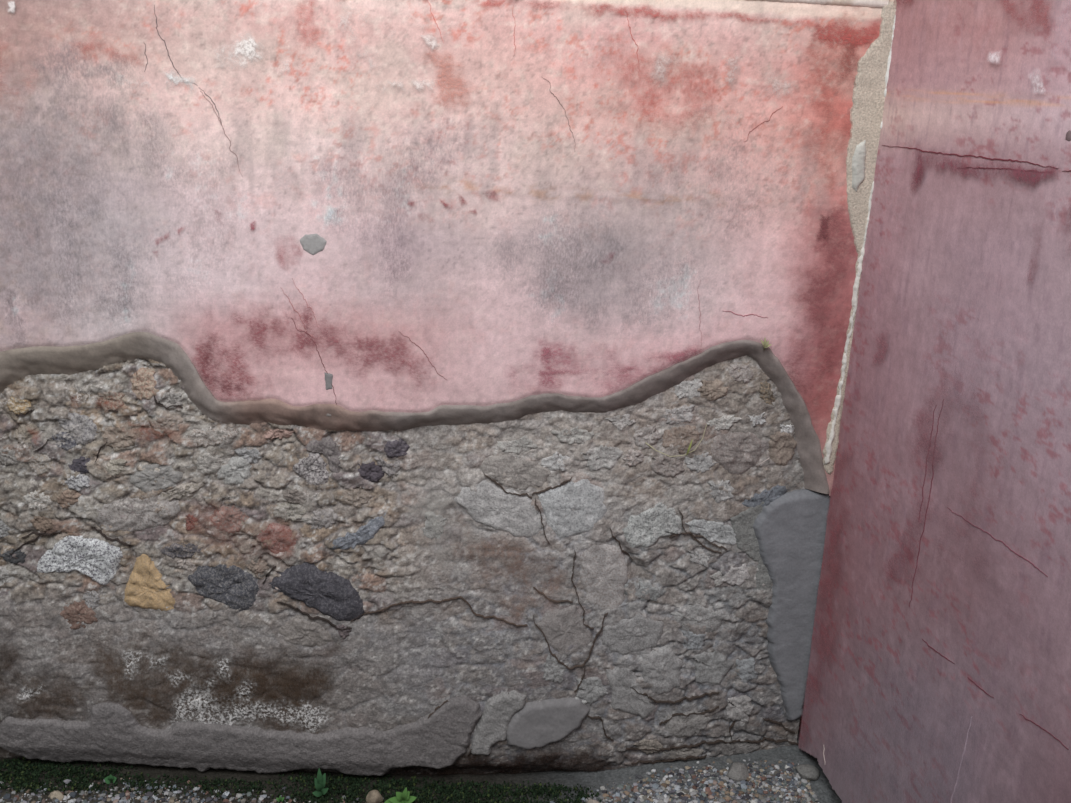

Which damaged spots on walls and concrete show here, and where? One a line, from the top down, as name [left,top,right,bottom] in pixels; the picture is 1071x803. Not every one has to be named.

crack [144,5,243,177]
peeling [222,37,260,65]
crack [293,320,337,405]
spalling [822,0,897,475]
flaking render [0,332,831,776]
crack [262,474,798,765]